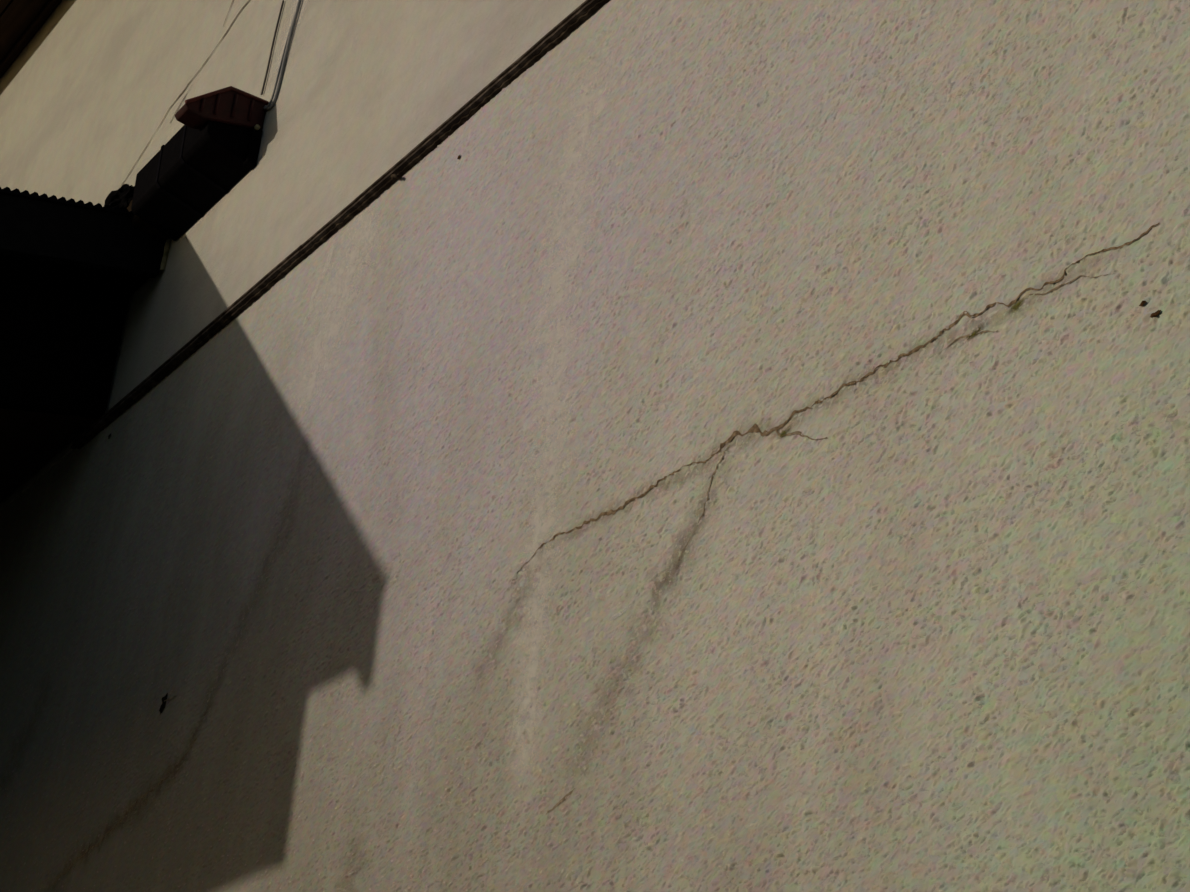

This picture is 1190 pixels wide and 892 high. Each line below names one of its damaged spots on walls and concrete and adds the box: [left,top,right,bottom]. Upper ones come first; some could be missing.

crack [502,223,1159,599]